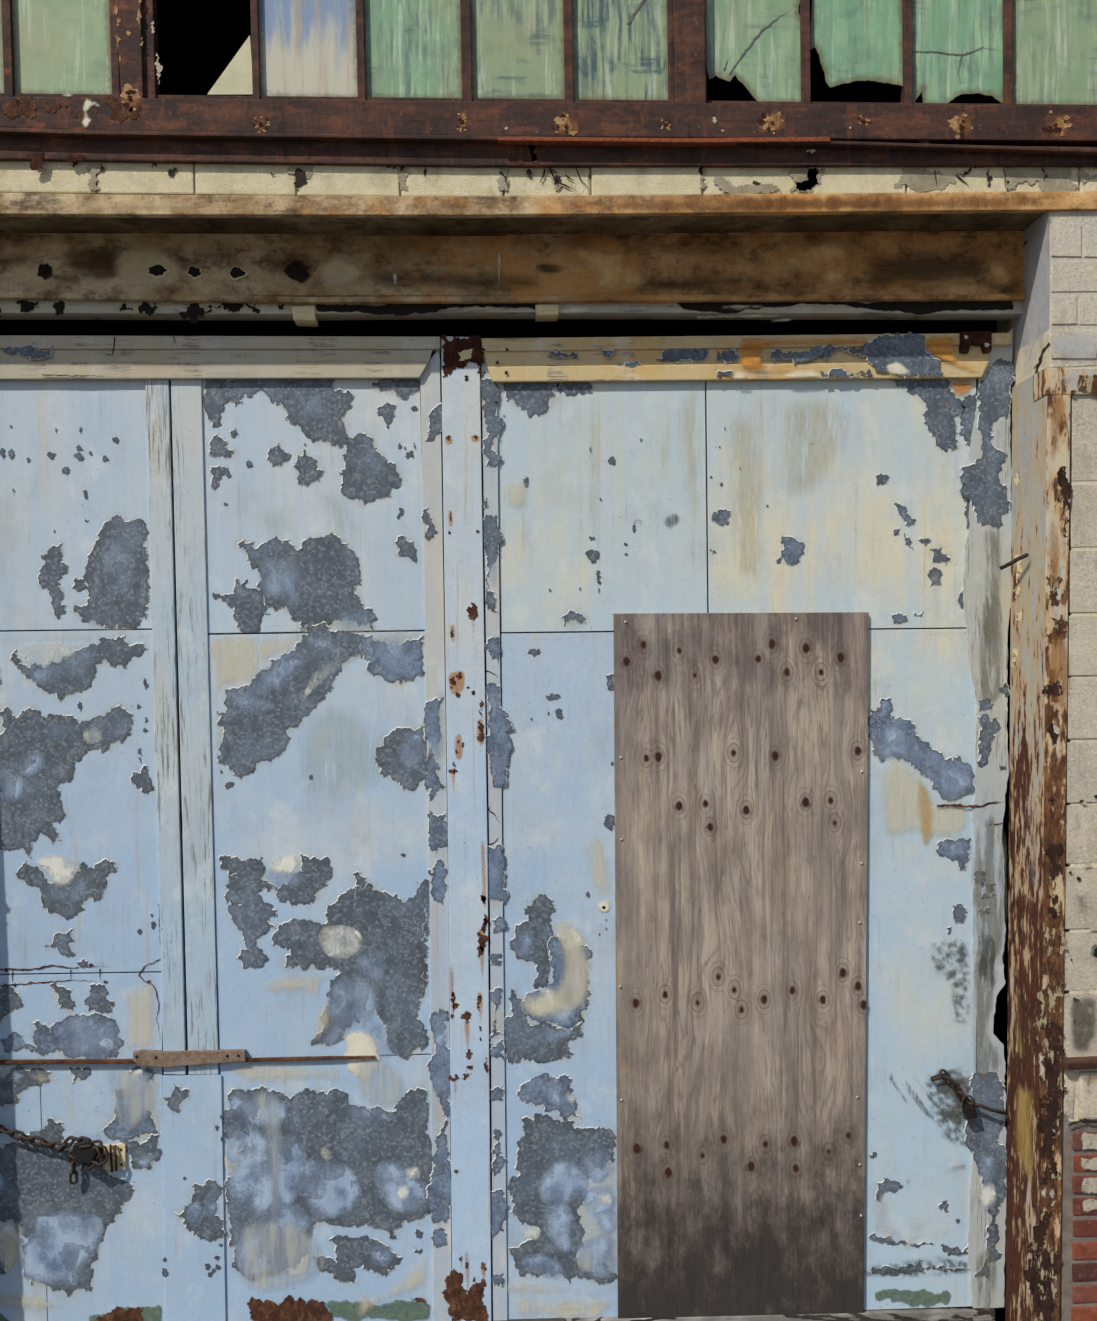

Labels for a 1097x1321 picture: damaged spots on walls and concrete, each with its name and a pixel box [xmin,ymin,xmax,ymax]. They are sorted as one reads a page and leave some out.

peeling [770,332,1019,529]
peeling [0,515,150,968]
peeling [212,533,425,789]
corrosion [1042,466,1072,703]
peeling [0,981,124,1108]
peeling [172,697,452,1283]
corrosion [1029,843,1094,1185]
peeling [0,1066,162,1297]
corrosion [96,1306,144,1321]
corrosion [247,1295,332,1321]
corrosion [442,1256,489,1321]
corrosion [1024,1210,1062,1321]